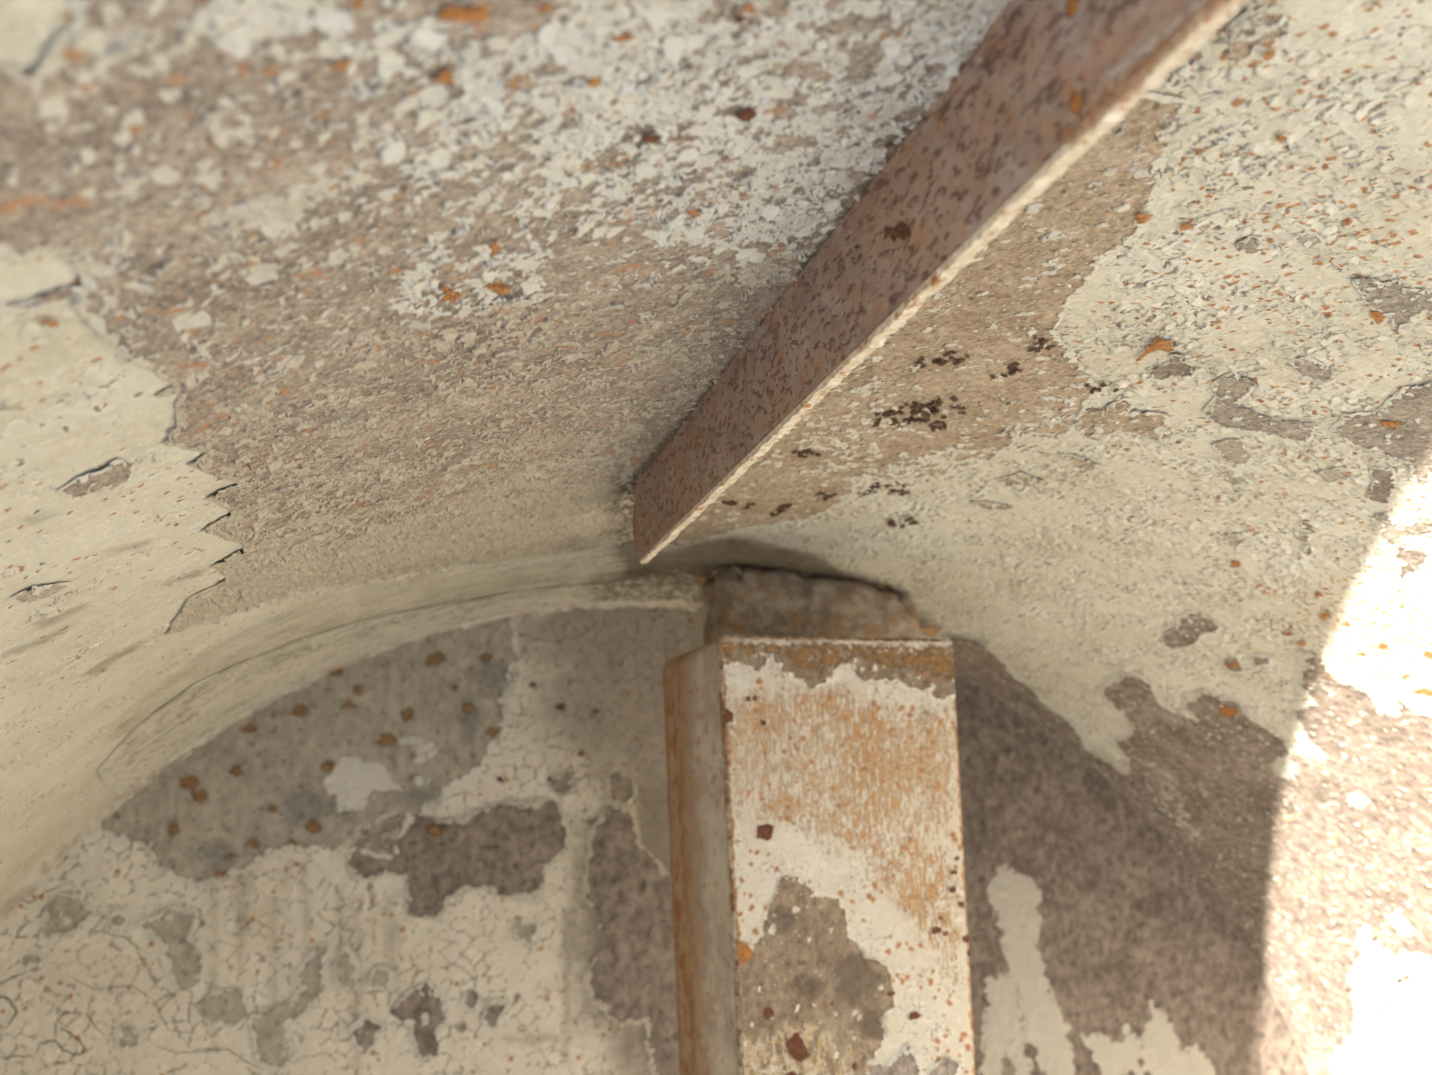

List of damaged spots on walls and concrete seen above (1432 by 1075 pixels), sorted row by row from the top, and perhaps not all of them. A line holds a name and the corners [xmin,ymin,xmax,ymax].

corrosion [733,108,757,123]
corrosion [1062,0,1229,143]
peeling [0,0,1015,635]
corrosion [594,476,897,603]
peeling [1149,354,1432,583]
peeling [1161,610,1224,652]
peeling [95,616,680,1075]
corrosion [722,619,970,964]
peeling [722,633,1432,1075]
crack [0,930,264,1071]
peeling [42,891,360,1073]
corrosion [742,1007,857,1075]